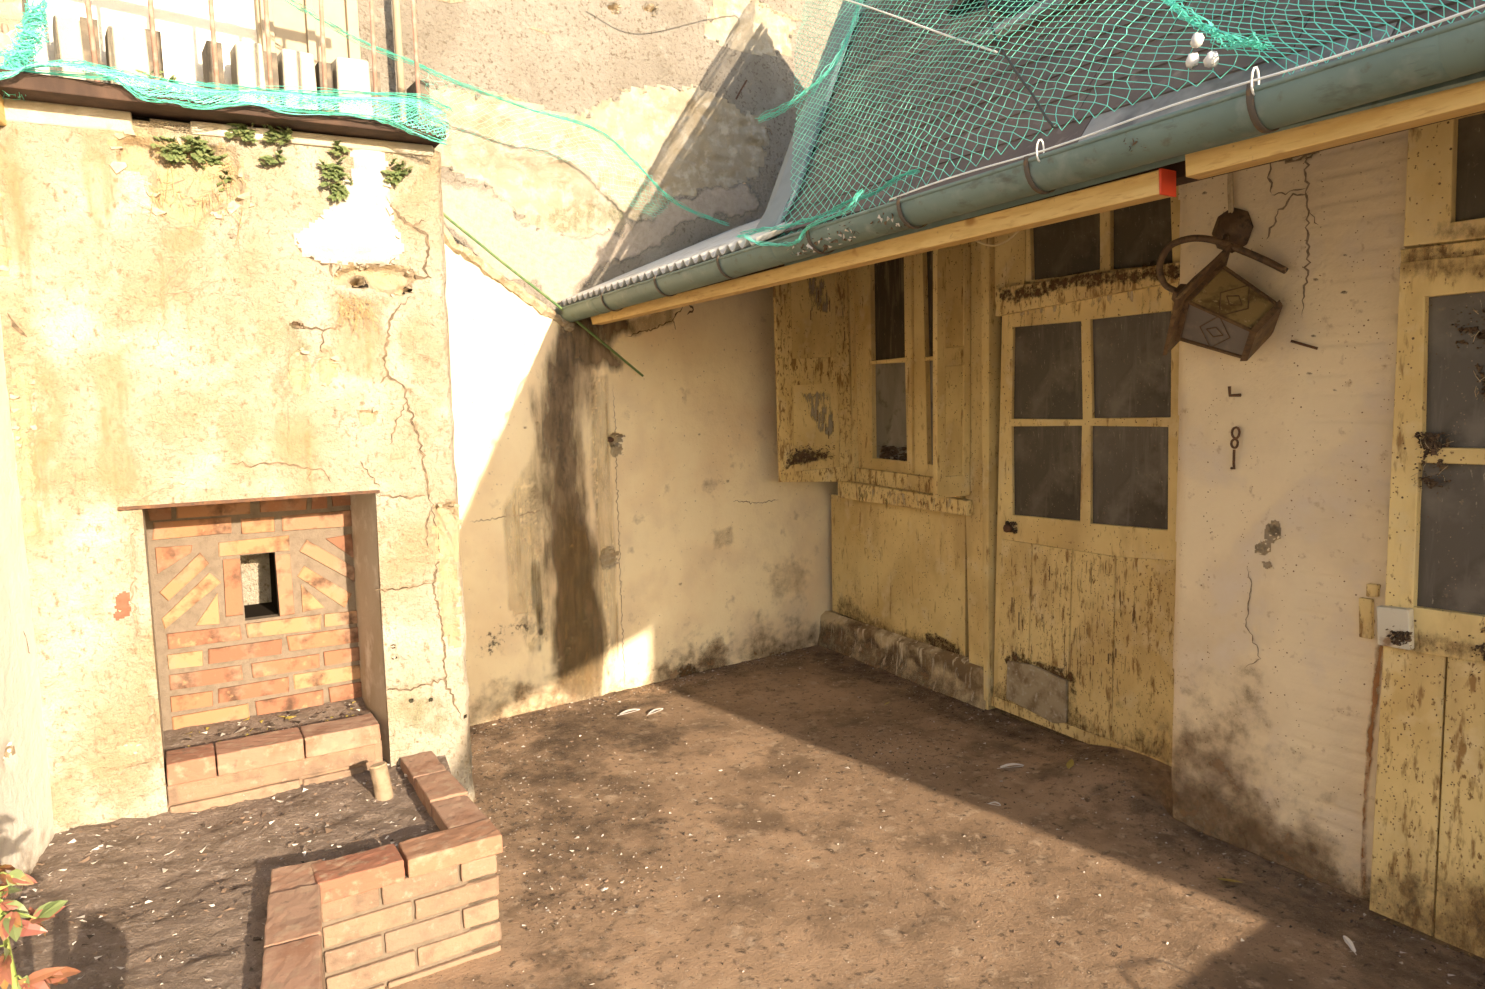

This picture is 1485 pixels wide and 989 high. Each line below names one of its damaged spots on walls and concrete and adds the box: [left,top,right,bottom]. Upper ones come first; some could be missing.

crack [1267,154,1318,311]
crack [231,197,462,720]
crack [474,510,540,523]
water stain [489,317,654,782]
water stain [651,641,727,684]
crack [1245,569,1261,666]
peeling [1255,520,1283,570]
water stain [1133,733,1360,903]